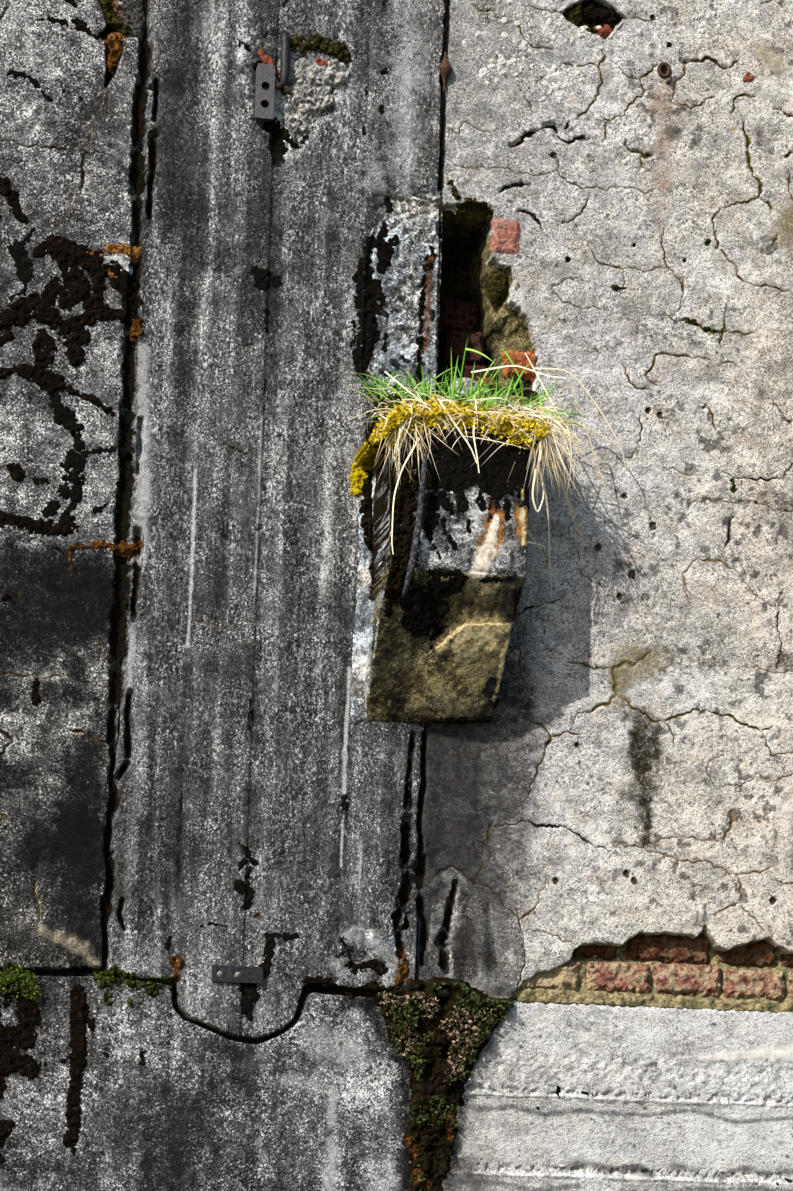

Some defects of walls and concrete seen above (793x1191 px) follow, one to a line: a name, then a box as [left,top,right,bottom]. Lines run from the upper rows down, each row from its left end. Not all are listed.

spalling [563,0,627,39]
crack [427,0,793,292]
spalling [361,188,458,389]
crack [551,232,753,390]
crack [703,404,716,430]
corrosion [68,539,144,572]
crack [664,463,793,673]
crack [391,547,793,995]
damp [611,645,660,848]
crack [172,985,357,1044]